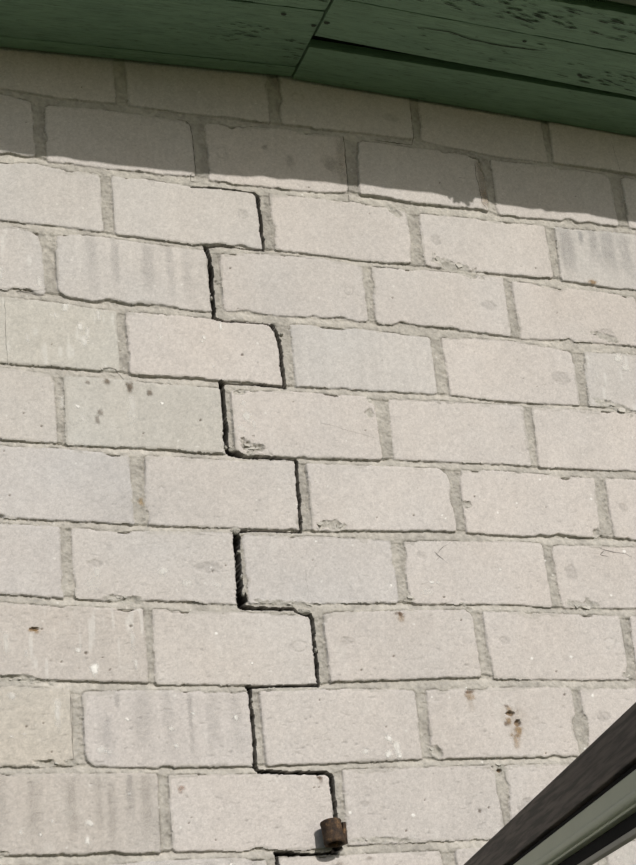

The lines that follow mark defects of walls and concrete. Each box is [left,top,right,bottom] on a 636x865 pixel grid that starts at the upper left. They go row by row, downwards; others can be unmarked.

crack [178,119,338,818]
crack [273,846,343,865]